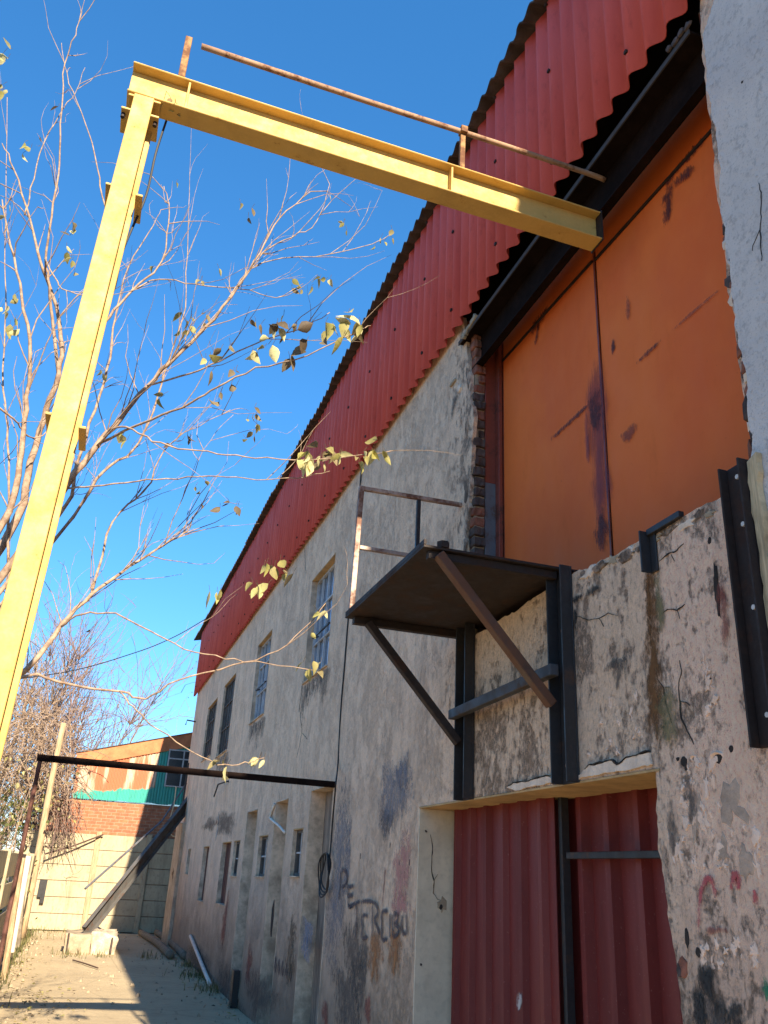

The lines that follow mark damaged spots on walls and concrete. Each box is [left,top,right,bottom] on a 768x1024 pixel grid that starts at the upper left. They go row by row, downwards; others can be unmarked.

crack [752,184,762,261]
spalling [450,335,486,554]
leakage [604,658,626,688]
crack [657,660,694,745]
spalling [507,775,551,791]
spalling [579,738,653,780]
peeling [668,745,762,882]
peeling [676,928,759,978]